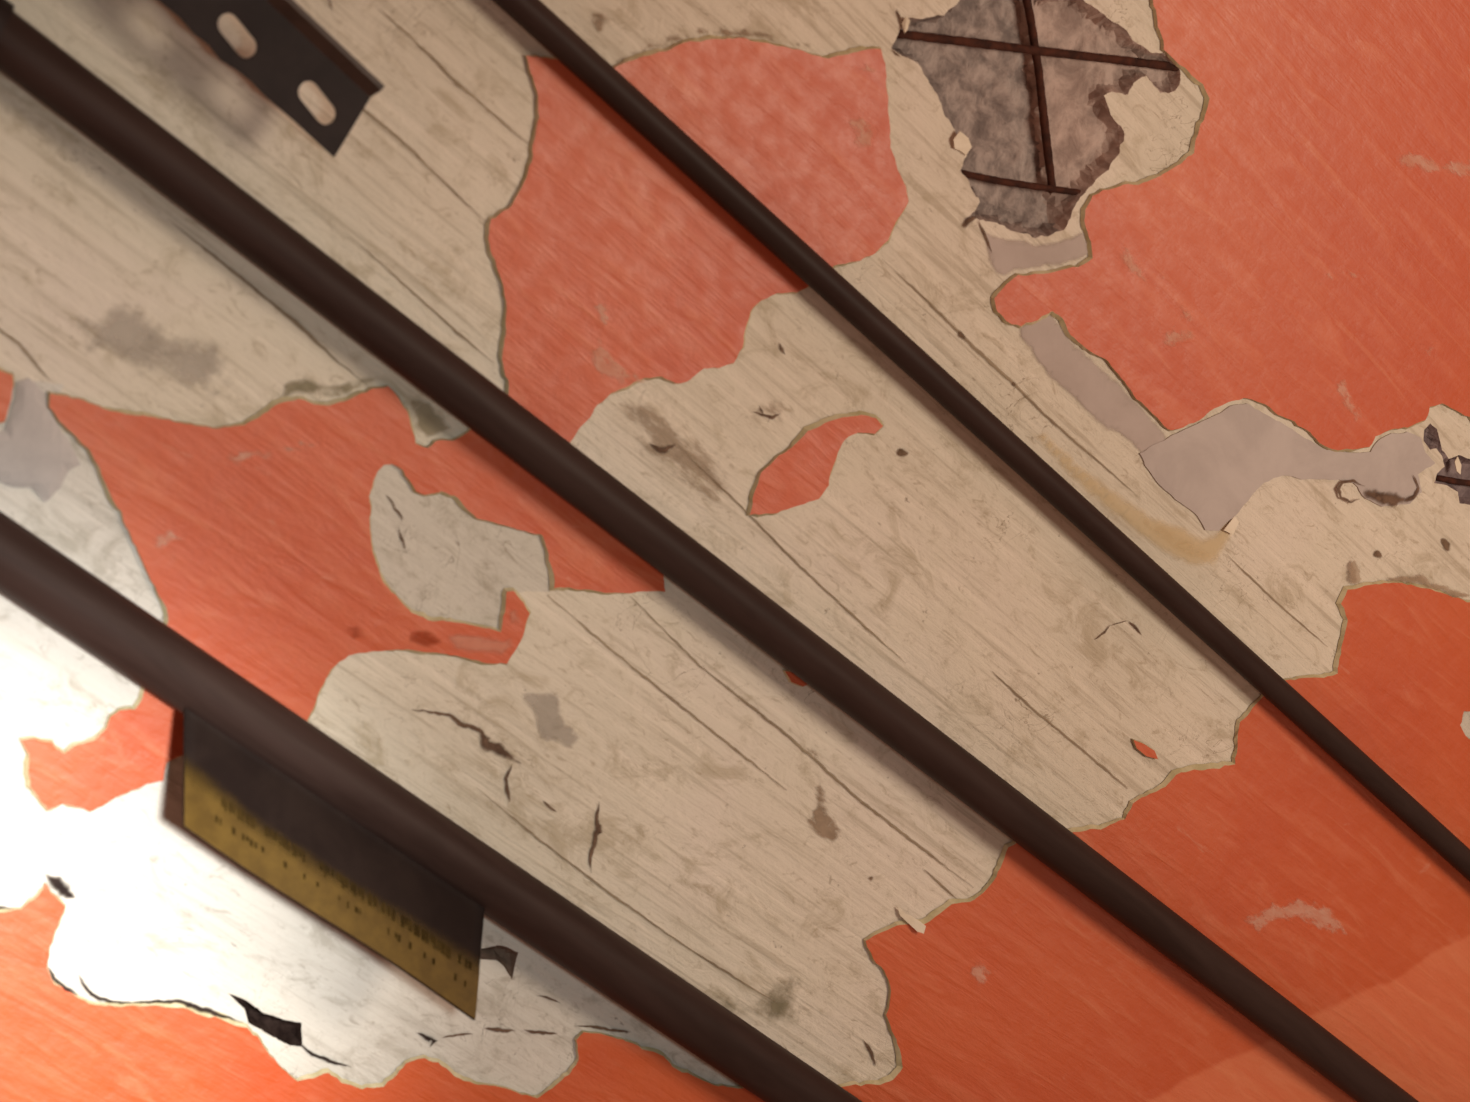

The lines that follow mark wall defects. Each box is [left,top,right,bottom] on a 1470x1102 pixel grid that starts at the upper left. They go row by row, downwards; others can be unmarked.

peeling [0,71,471,625]
peeling [8,0,558,395]
peeling [0,592,744,1098]
crack [415,710,555,811]
peeling [307,464,1016,1087]
peeling [570,286,1263,832]
peeling [540,0,1470,680]
peeling [1460,711,1470,739]